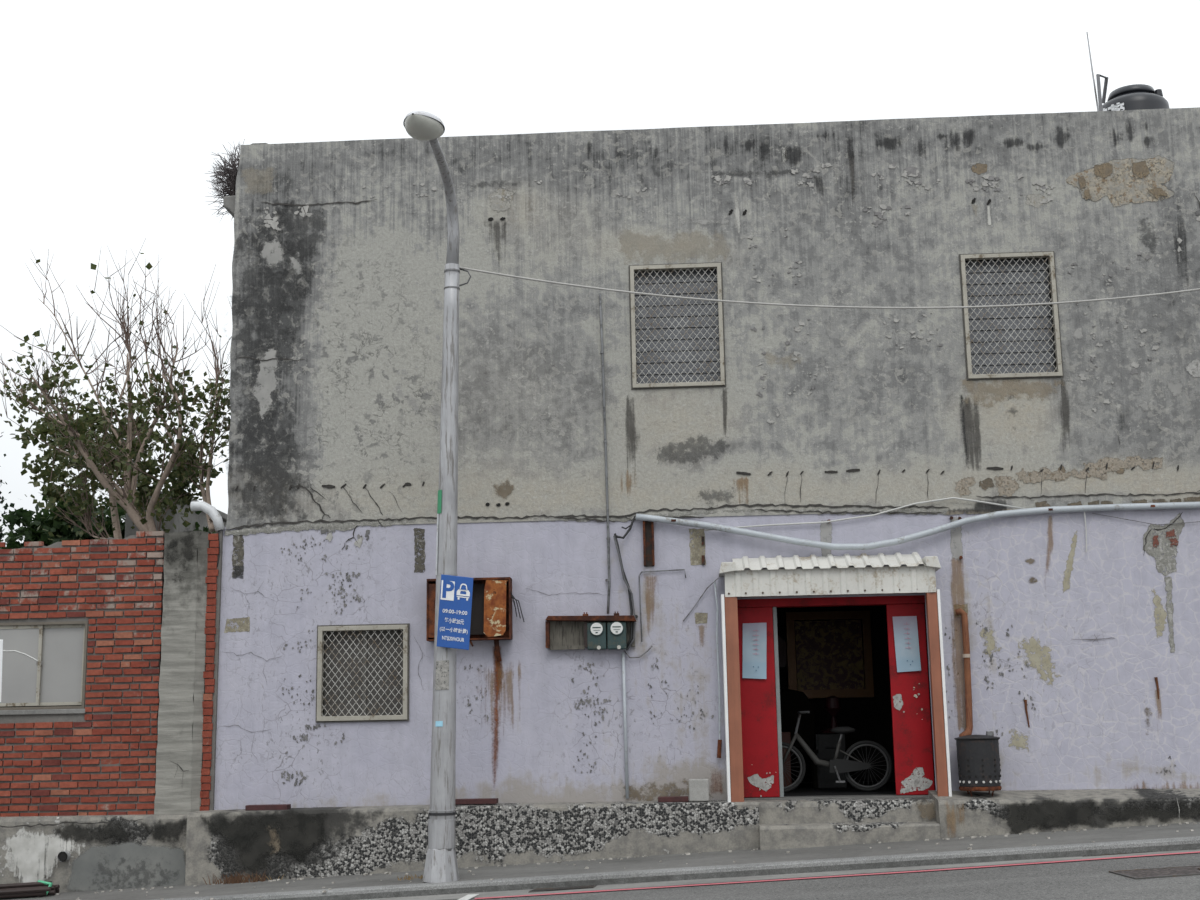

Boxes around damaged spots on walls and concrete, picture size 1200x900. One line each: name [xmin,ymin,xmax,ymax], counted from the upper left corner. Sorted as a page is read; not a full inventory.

spalling [965,155,1174,207]
damp [626,399,636,460]
damp [961,396,981,468]
spalling [946,456,1163,515]
spalling [1131,497,1200,653]
peeling [976,622,1060,710]
corrosion [491,648,520,782]
peeling [748,772,776,797]
peeling [900,767,933,794]